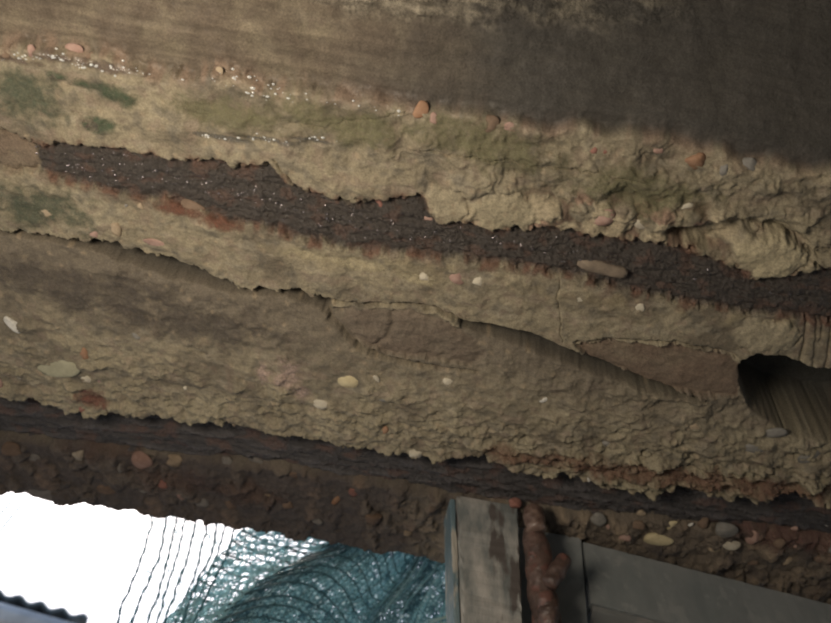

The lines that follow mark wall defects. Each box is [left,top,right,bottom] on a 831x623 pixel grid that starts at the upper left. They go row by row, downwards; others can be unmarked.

crack [0,229,708,405]
spalling [0,397,831,604]